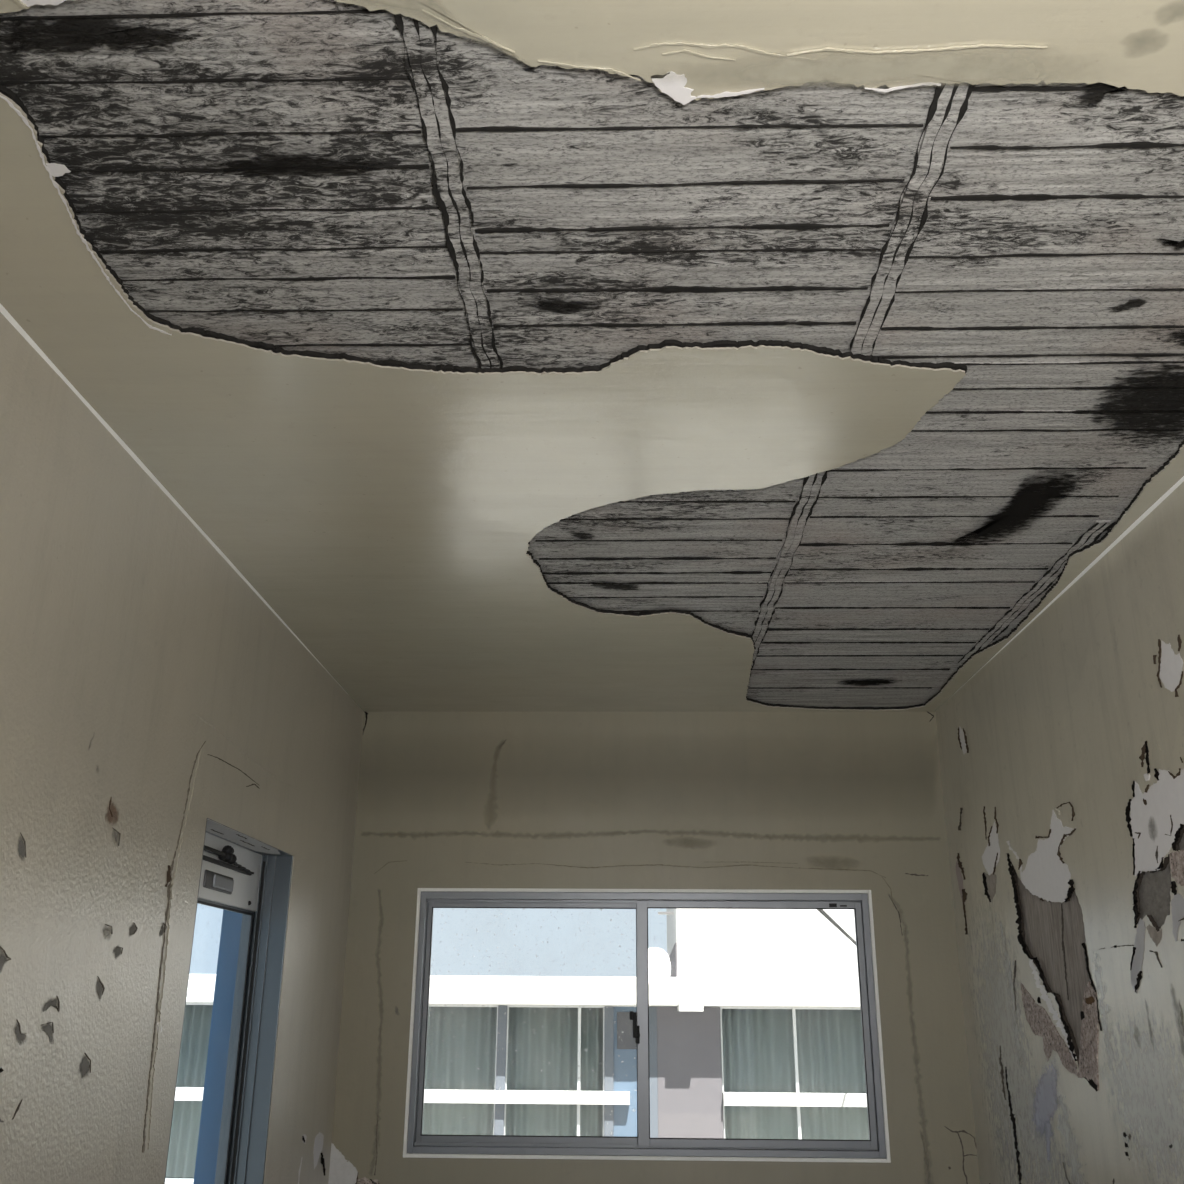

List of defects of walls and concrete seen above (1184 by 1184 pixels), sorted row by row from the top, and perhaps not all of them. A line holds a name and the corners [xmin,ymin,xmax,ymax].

spalling [0,0,1184,710]
peeling [18,832,26,858]
peeling [956,853,968,935]
peeling [1125,768,1184,994]
peeling [0,946,11,973]
peeling [104,924,123,958]
crack [142,713,300,1153]
peeling [15,1019,26,1043]
peeling [42,996,60,1042]
spalling [977,802,1102,1184]
peeling [80,1053,91,1078]
peeling [298,1132,379,1184]